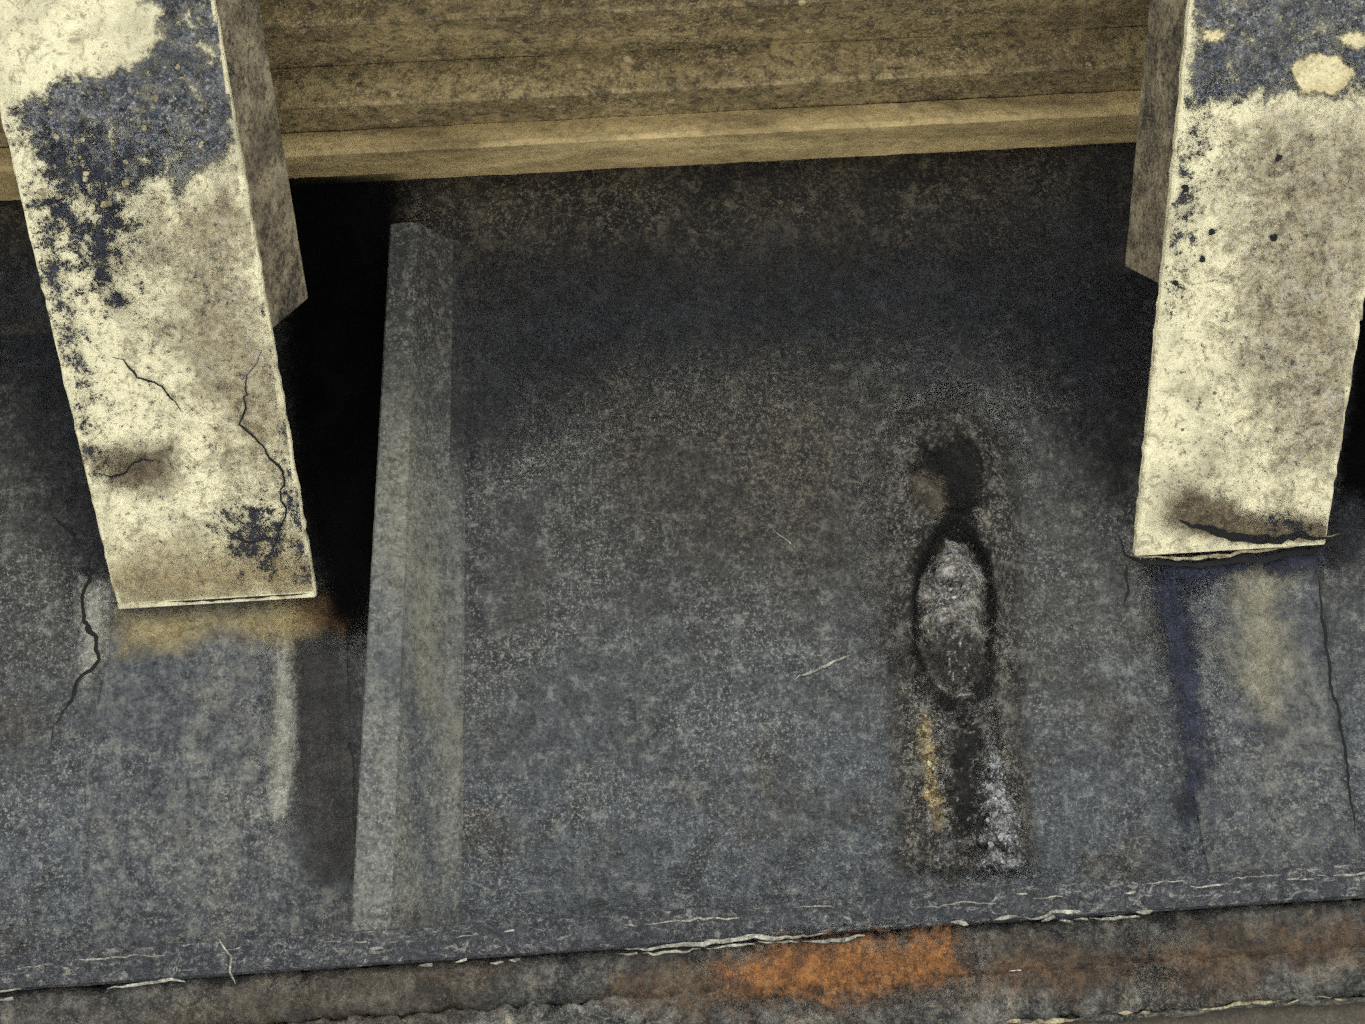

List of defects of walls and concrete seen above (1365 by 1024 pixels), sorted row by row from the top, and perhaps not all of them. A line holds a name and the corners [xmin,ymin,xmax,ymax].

crack [17,131,315,745]
crack [1118,518,1356,836]
water stain [1144,489,1365,856]
corrosion [722,941,956,992]